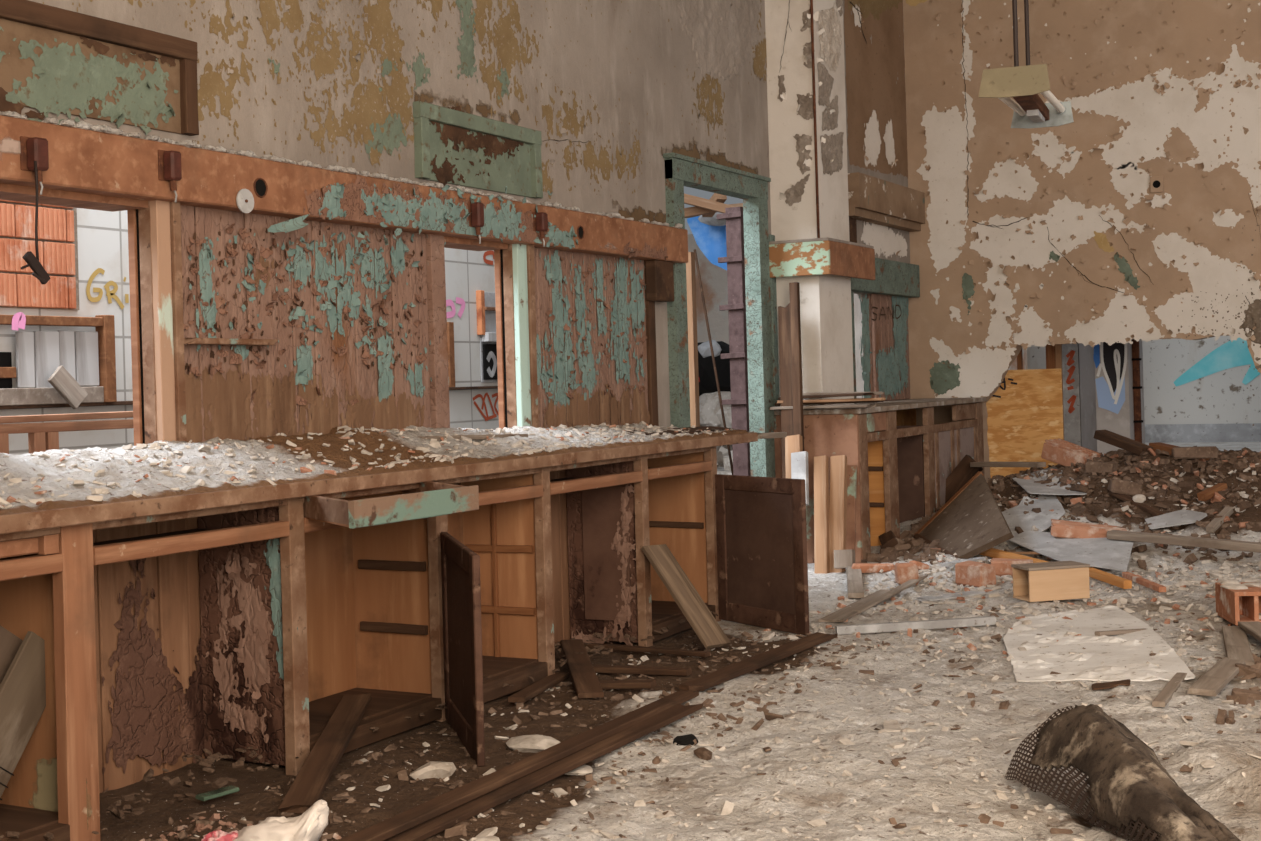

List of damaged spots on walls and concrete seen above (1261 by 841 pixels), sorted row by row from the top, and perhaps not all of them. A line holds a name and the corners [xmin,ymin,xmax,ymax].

peeling [0,26,178,135]
peeling [681,69,728,155]
peeling [178,0,668,443]
peeling [861,221,907,259]
peeling [859,293,909,399]
peeling [100,538,284,774]